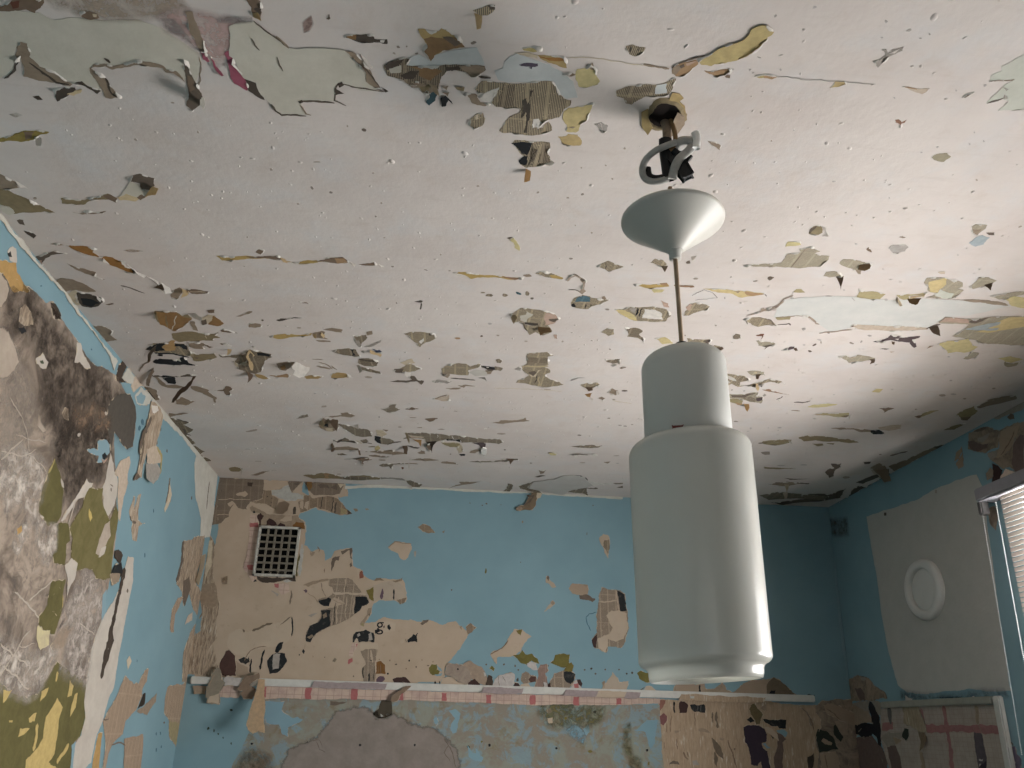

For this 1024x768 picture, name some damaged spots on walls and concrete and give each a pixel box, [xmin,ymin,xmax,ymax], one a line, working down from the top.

flaking render [0,11,201,93]
flaking render [229,22,380,116]
peeling [384,28,600,182]
peeling [696,15,782,79]
peeling [889,236,908,254]
peeling [969,224,994,247]
flaking render [693,241,1024,357]
water stain [9,297,115,497]
flaking render [0,245,532,768]
peeling [569,583,629,653]
flaking render [207,677,829,768]
peeling [851,702,887,768]